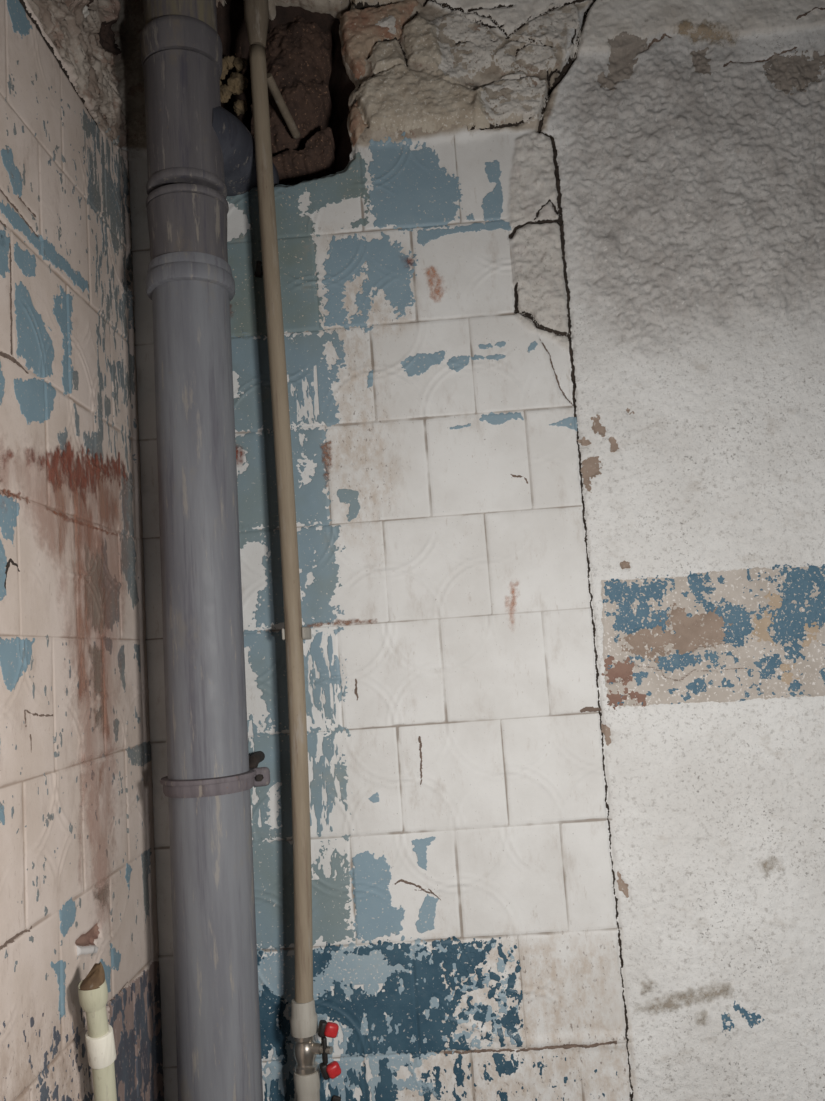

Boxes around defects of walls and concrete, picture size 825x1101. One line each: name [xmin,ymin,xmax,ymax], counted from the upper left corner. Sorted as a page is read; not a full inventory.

hole [216,0,254,137]
crack [723,47,797,67]
crack [796,7,825,20]
peeling [0,74,151,802]
corrosion [29,441,127,731]
peeling [226,187,297,1101]
peeling [265,0,584,1101]
crack [347,0,740,1101]
spalling [549,414,619,493]
peeling [601,560,825,710]
peeling [22,848,164,1101]
peeling [721,1001,765,1035]